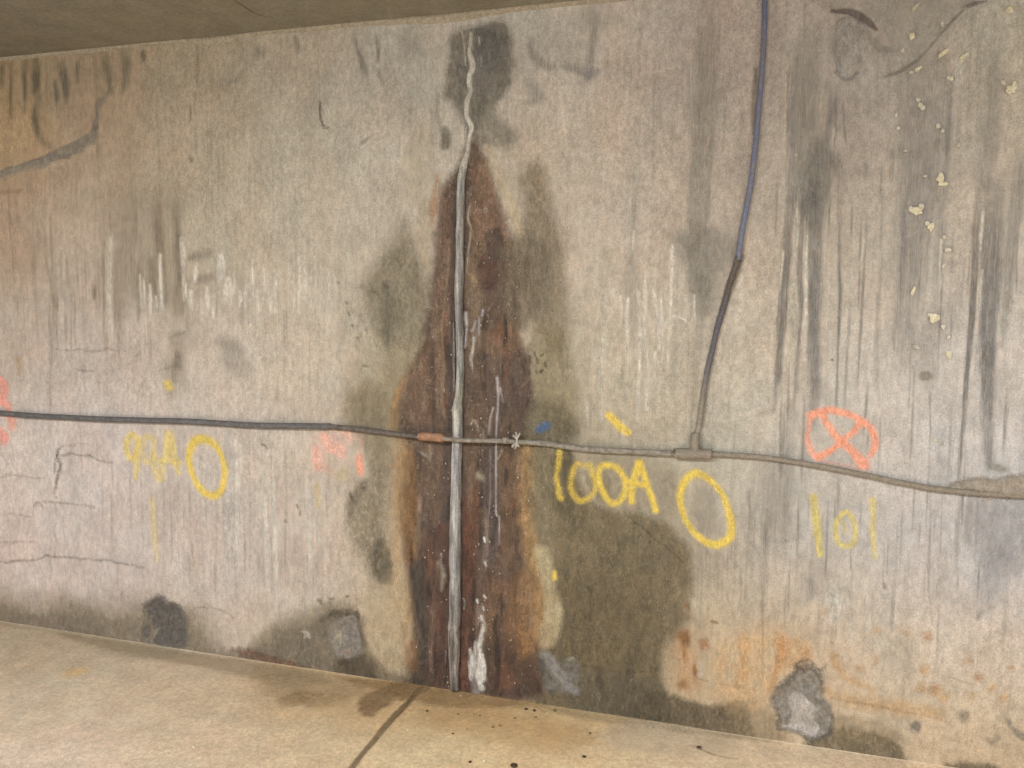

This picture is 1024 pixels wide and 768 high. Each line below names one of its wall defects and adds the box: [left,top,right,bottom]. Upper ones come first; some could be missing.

damp [0,21,787,742]
rust [370,138,562,700]
damp [774,59,852,416]
damp [880,97,951,330]
damp [958,185,1023,481]
damp [957,501,1024,561]
spalling [770,659,834,743]